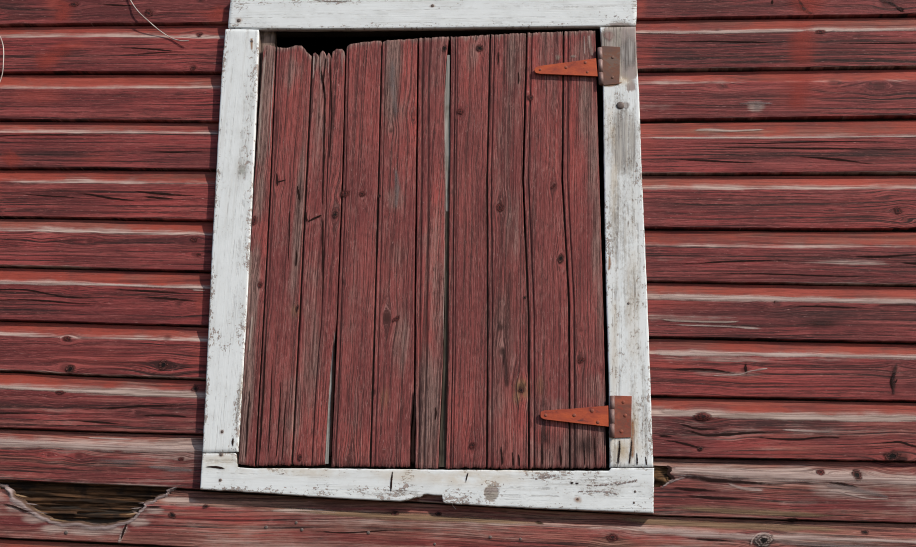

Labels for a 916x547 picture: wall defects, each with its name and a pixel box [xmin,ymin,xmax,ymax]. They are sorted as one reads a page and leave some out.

crack [276,59,333,297]